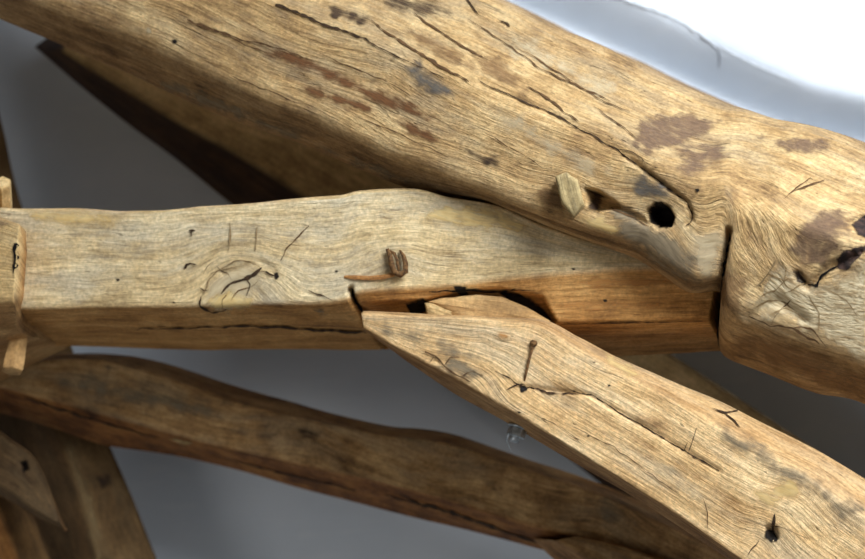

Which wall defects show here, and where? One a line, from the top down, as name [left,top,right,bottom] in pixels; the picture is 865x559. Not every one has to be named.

crack [187,19,420,104]
crack [275,0,693,227]
crack [132,267,366,334]
crack [749,256,856,345]
crack [425,351,719,471]
crack [533,412,708,526]